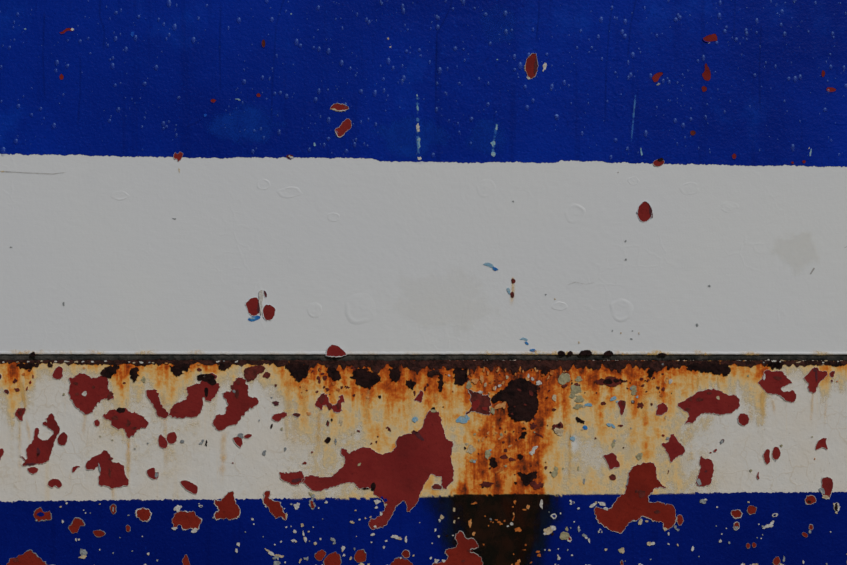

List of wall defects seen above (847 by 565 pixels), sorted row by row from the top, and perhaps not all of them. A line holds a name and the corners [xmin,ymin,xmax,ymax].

peeling [20,413,68,474]
peeling [3,360,149,439]
peeling [72,450,129,489]
peeling [172,480,203,533]
peeling [123,360,277,449]
peeling [262,406,454,565]
corrosion [0,350,847,565]
peeling [271,344,674,480]
peeling [569,453,684,546]
peeling [696,439,724,487]
peeling [678,388,750,426]
peeling [758,359,797,403]